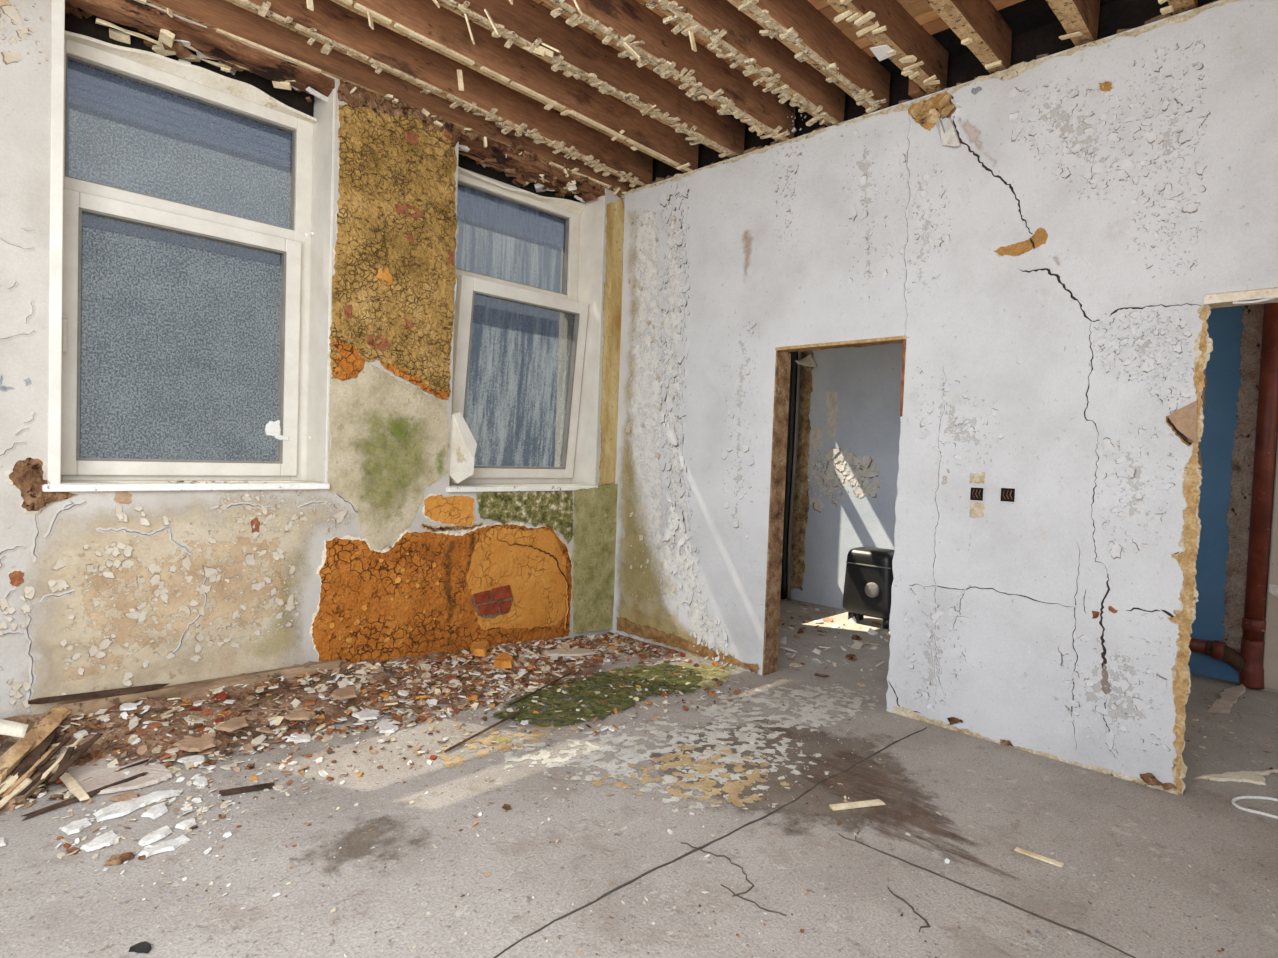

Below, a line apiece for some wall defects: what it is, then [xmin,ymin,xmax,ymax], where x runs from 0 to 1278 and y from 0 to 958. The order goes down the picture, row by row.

peeling [0,0,92,65]
peeling [109,28,254,75]
crack [950,116,1034,237]
crack [0,411,37,459]
crack [0,499,209,712]
damp [25,362,450,715]
spalling [0,480,573,695]
spalling [272,0,1239,812]
crack [493,266,1202,958]
spalling [1222,304,1264,653]
crack [1233,297,1274,305]
damp [651,720,1012,877]